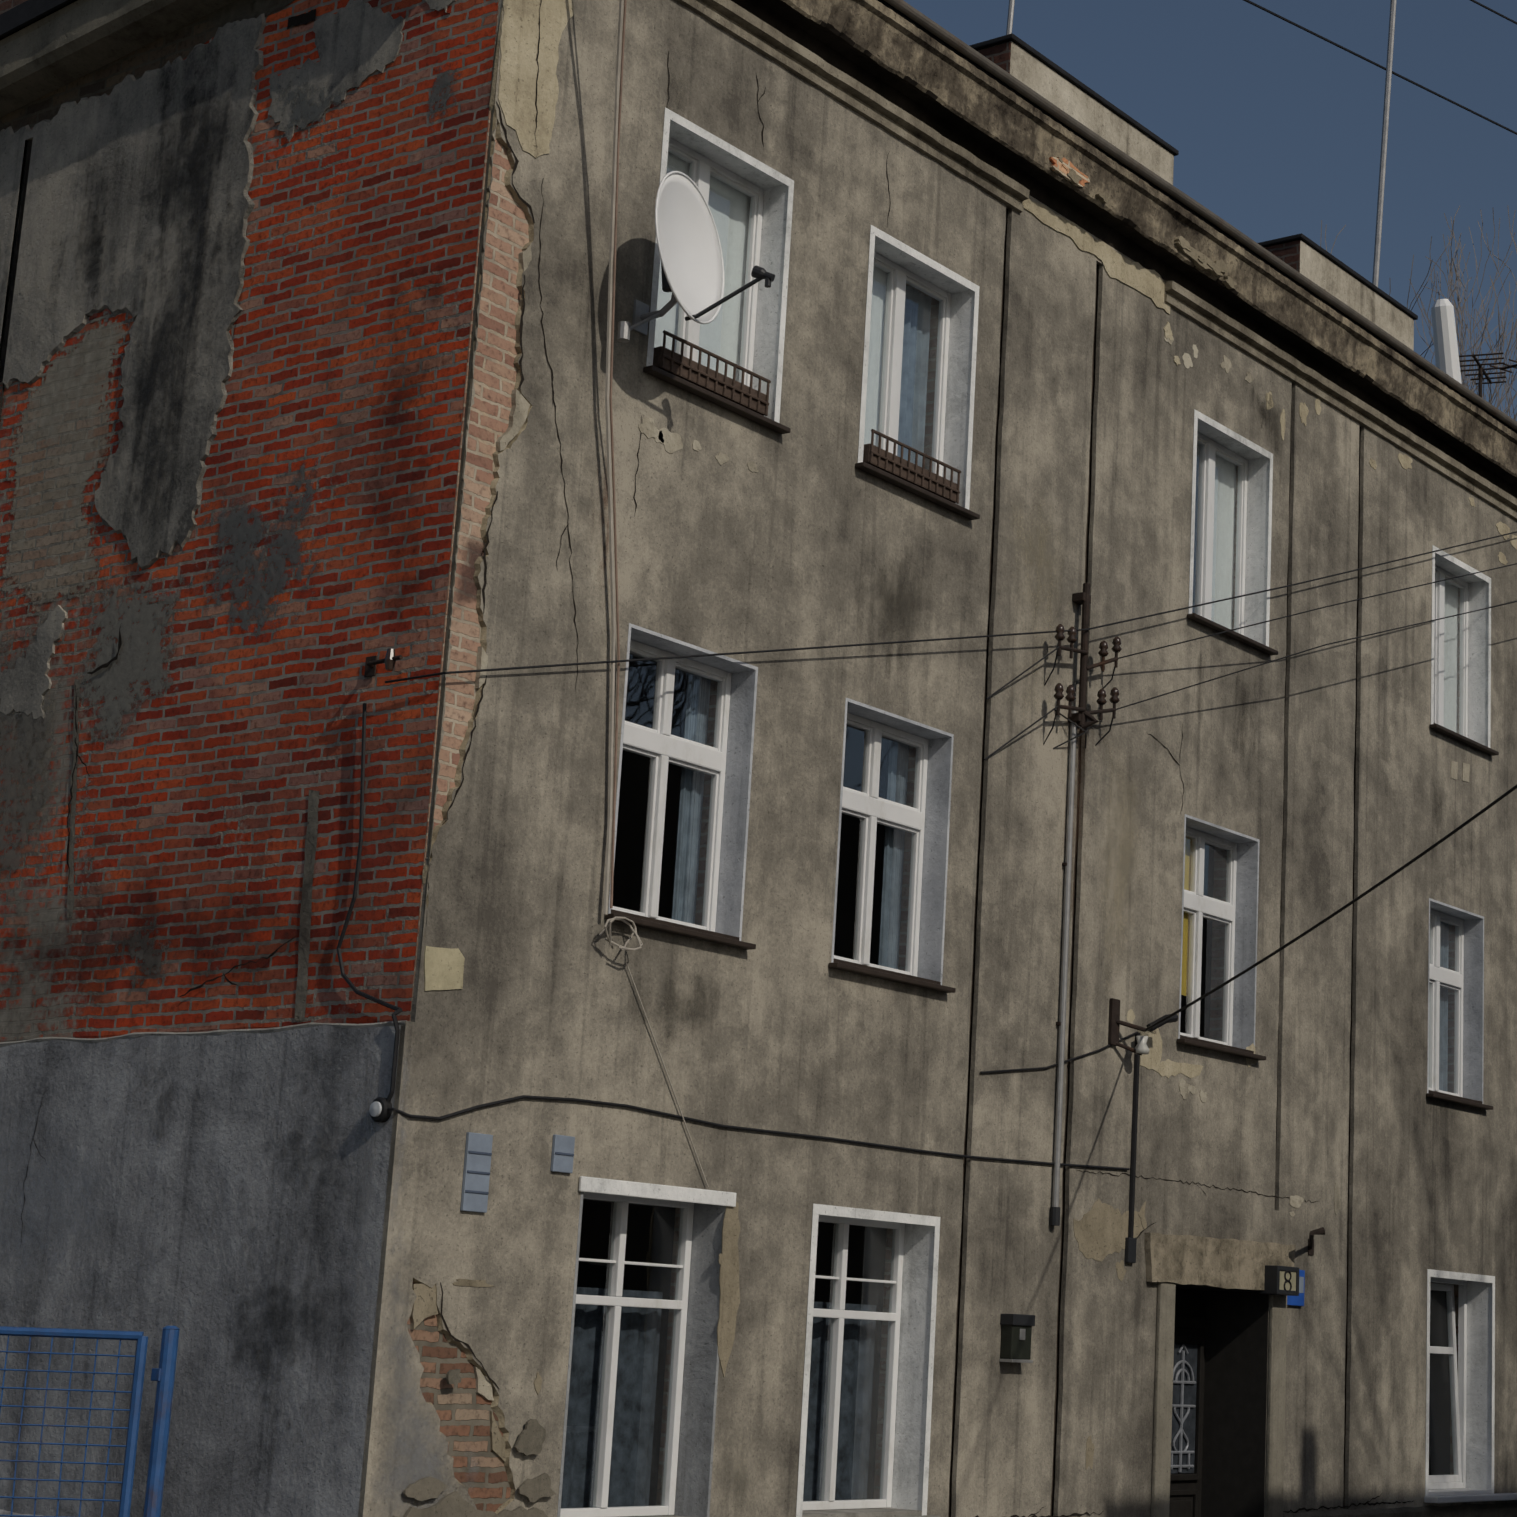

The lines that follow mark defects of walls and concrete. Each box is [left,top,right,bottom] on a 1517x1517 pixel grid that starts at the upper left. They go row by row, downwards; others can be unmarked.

flaking render [0,0,574,1041]
crack [535,0,578,682]
peeling [1050,156,1082,185]
peeling [1022,199,1198,369]
peeling [1266,392,1321,440]
flaking render [392,1278,555,1517]